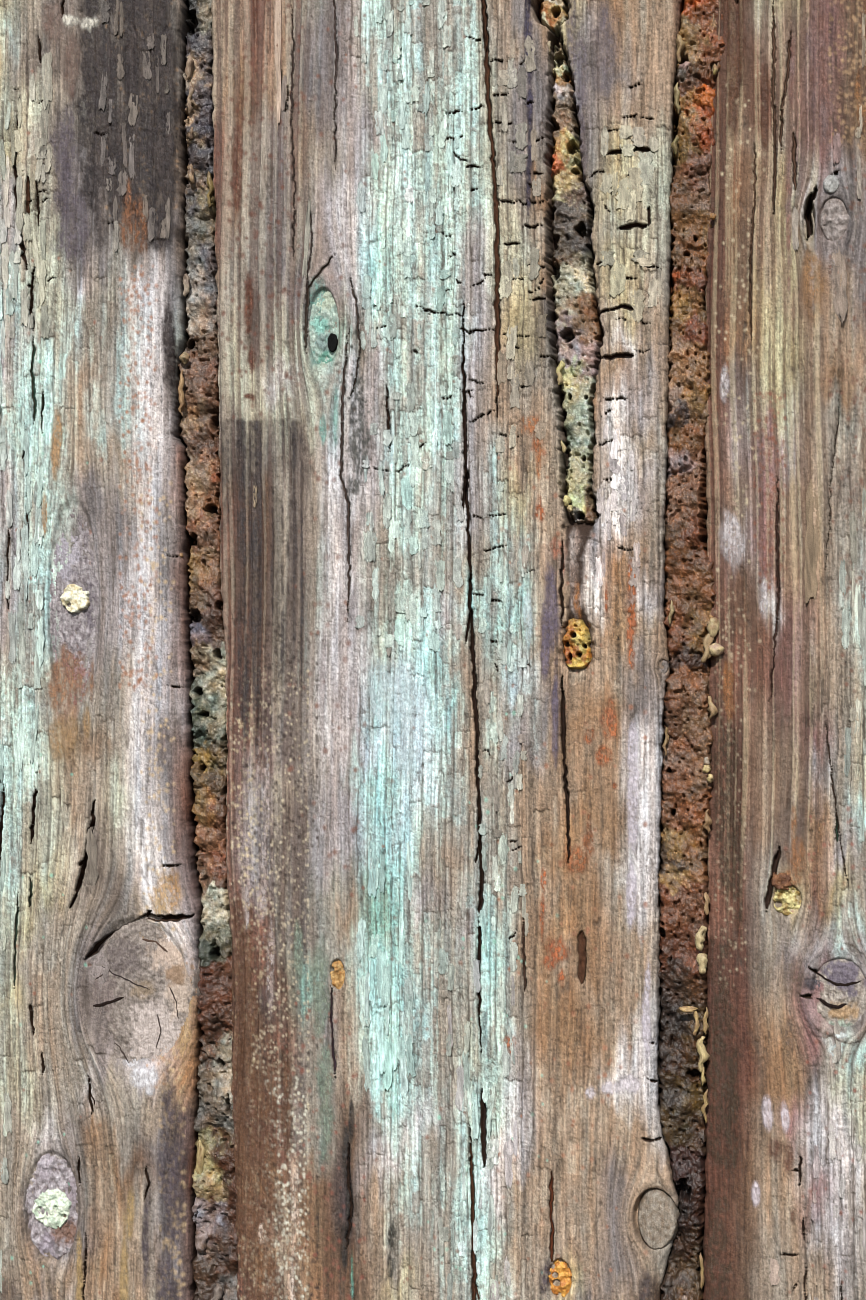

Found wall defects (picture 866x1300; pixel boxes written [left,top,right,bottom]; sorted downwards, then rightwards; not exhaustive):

peeling [99,54,138,252]
peeling [356,0,461,239]
peeling [0,51,53,689]
peeling [355,381,465,657]
crack [417,0,557,991]
crack [526,541,564,628]
crack [69,800,96,908]
peeling [356,840,416,1099]
crack [475,992,483,1052]
peeling [438,677,529,1188]
crack [561,676,570,863]
crack [469,1088,486,1300]